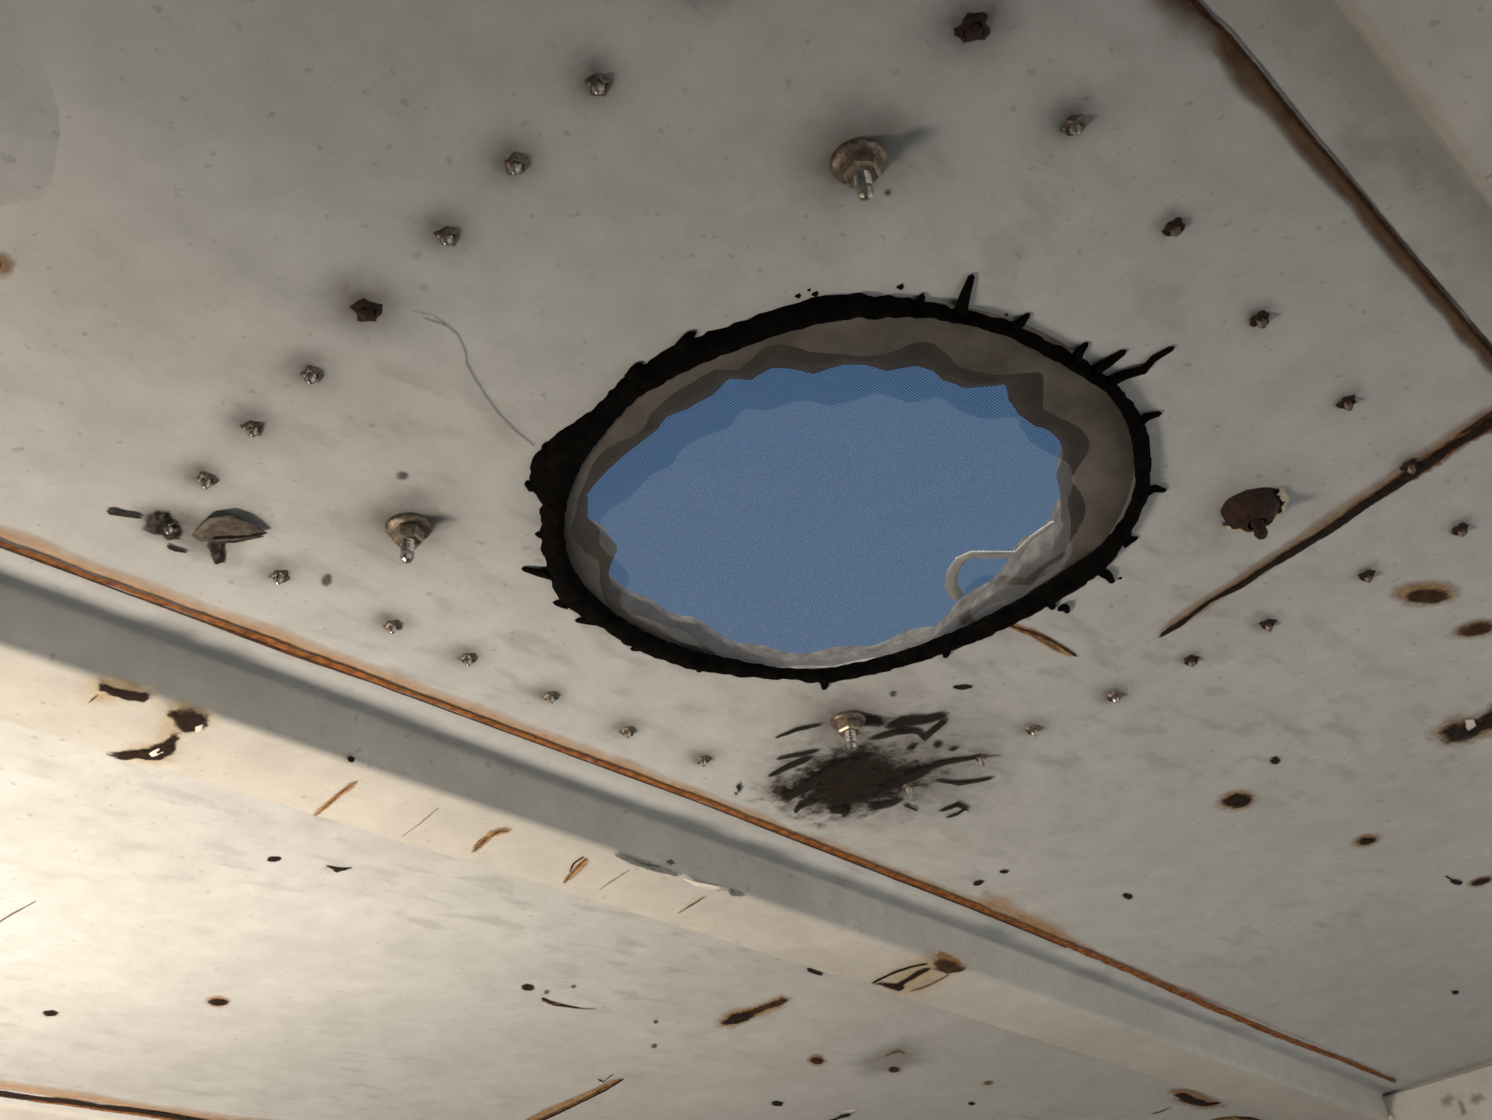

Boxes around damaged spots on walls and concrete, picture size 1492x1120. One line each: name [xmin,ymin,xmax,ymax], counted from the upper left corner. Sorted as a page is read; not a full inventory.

corrosion [1220,487,1281,532]
corrosion [1396,583,1454,605]
corrosion [1456,621,1492,637]
corrosion [1440,712,1492,744]
corrosion [0,541,1396,1083]
corrosion [0,1091,203,1120]
corrosion [527,1074,624,1120]